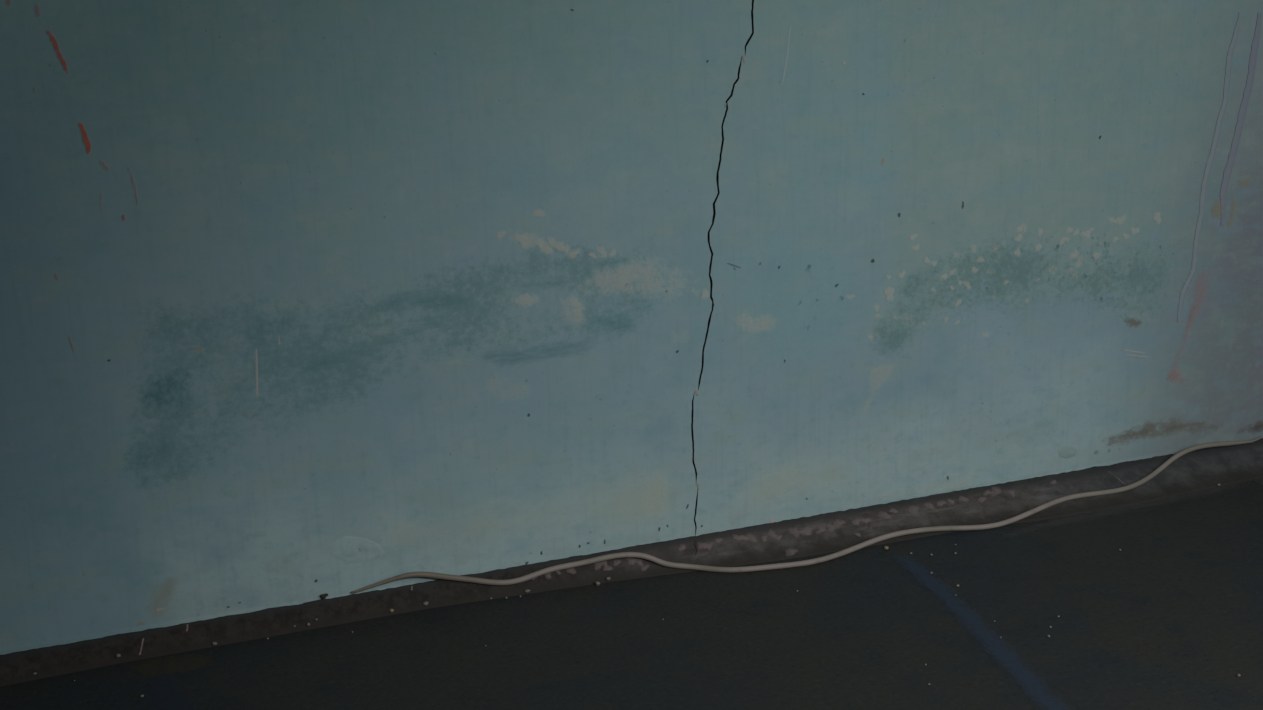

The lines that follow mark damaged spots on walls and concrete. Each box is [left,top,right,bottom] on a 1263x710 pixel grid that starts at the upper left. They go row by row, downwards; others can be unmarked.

crack [691,0,754,554]